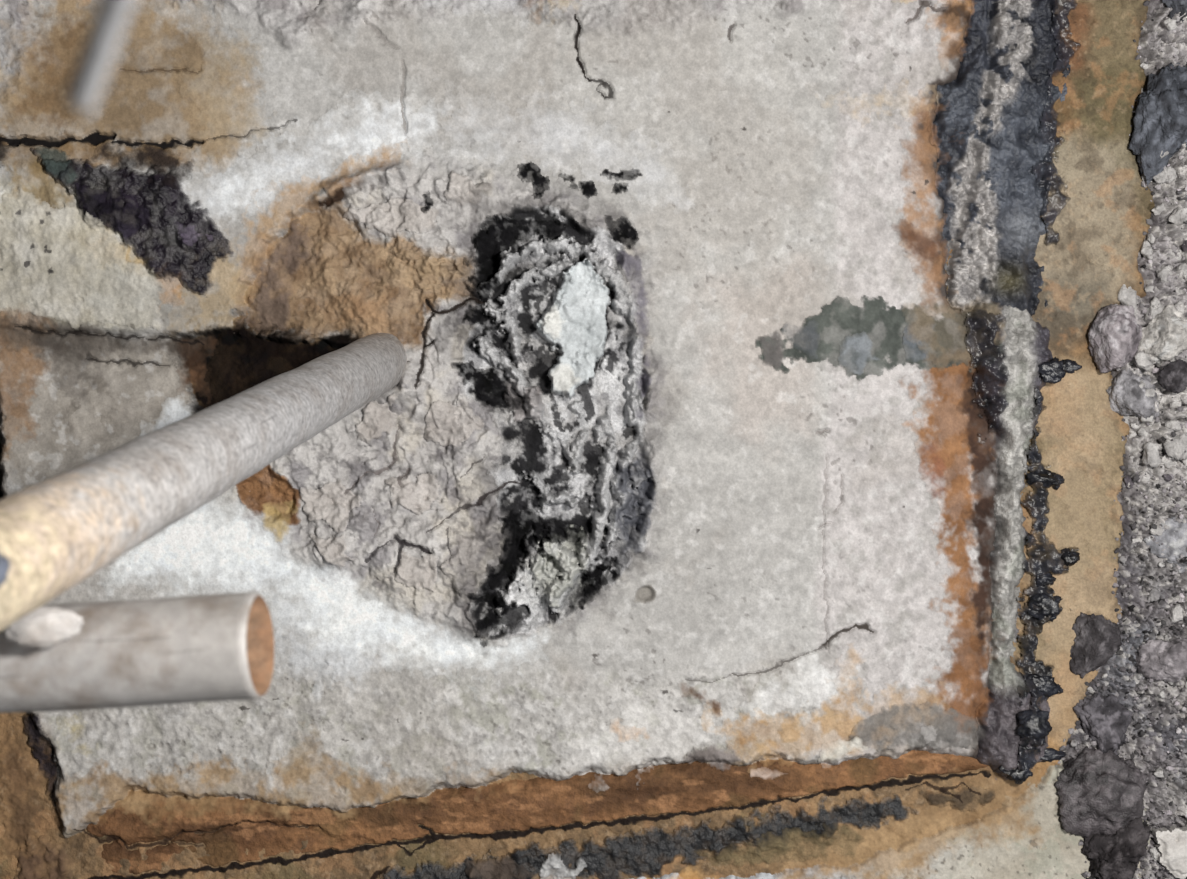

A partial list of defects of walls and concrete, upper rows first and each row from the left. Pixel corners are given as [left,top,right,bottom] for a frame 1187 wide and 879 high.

crack [573,14,614,99]
crack [0,120,293,150]
corrosion [158,138,410,333]
spalling [220,146,689,658]
corrosion [678,363,1006,780]
corrosion [55,711,520,844]
crack [72,770,991,879]
corrosion [644,865,720,879]
corrosion [754,754,1059,879]